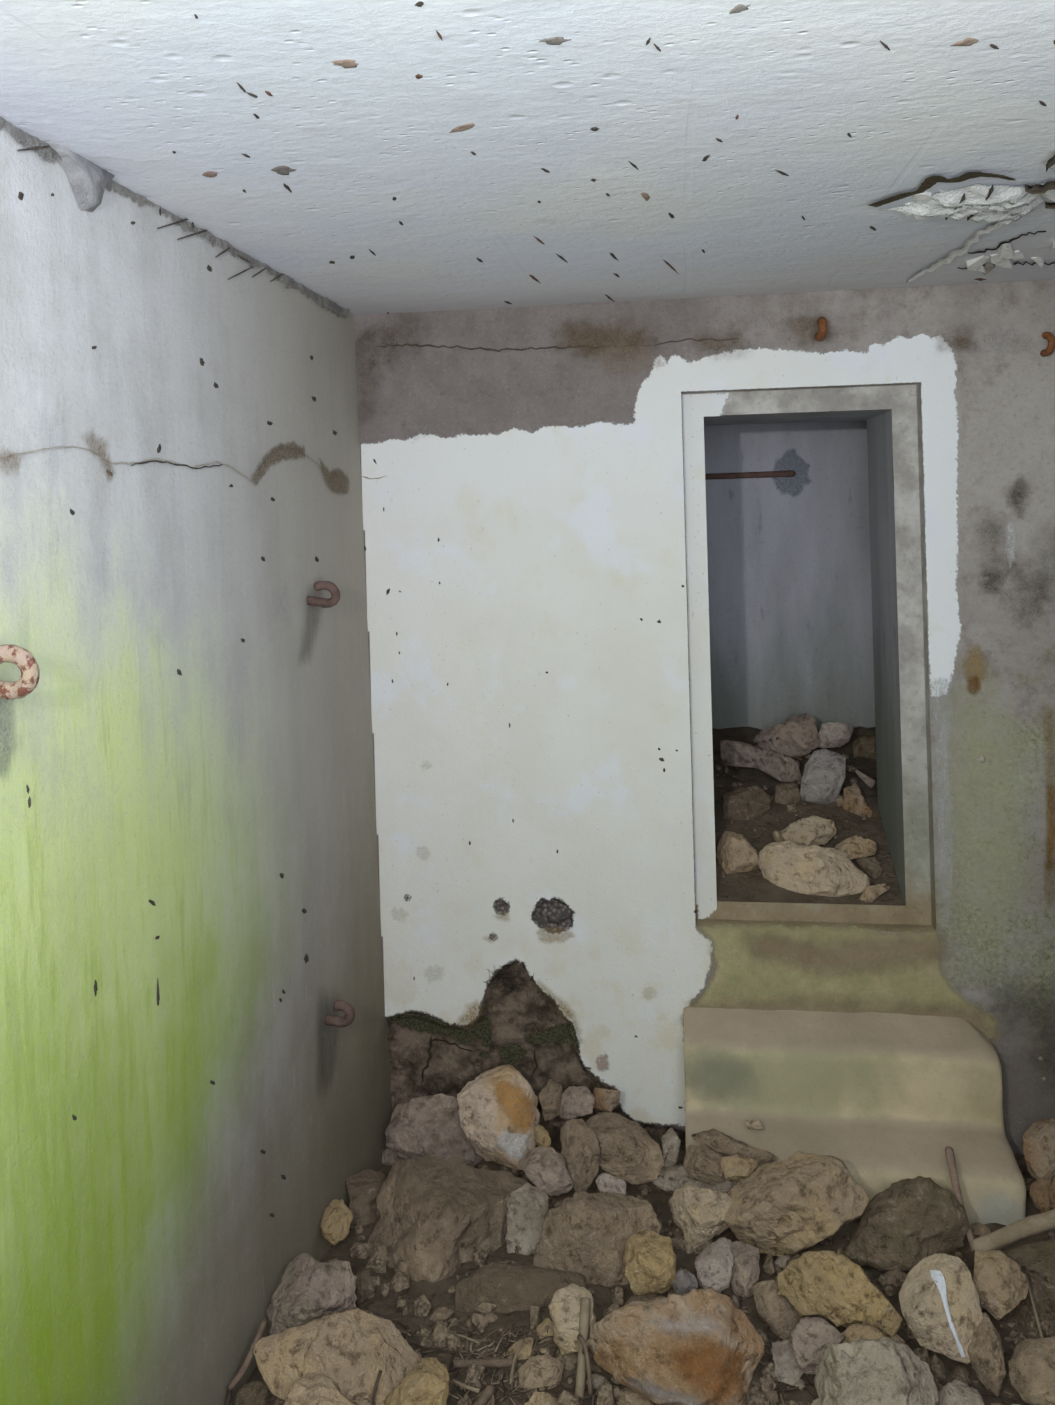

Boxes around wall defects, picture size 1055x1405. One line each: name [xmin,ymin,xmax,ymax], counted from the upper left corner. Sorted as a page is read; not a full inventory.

crack [377,338,738,352]
crack [0,446,385,481]
rust [1047,786,1055,868]
spalling [494,898,510,915]
spalling [531,898,574,940]
spalling [385,961,686,1144]